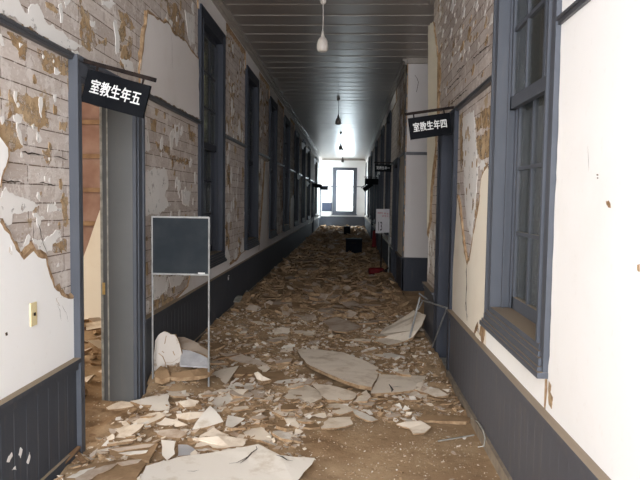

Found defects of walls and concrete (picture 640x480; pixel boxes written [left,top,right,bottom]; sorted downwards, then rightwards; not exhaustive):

flaking render [0,25,74,299]
flaking render [0,0,199,83]
flaking render [145,96,198,315]
flaking render [225,23,246,265]
flaking render [434,0,494,264]